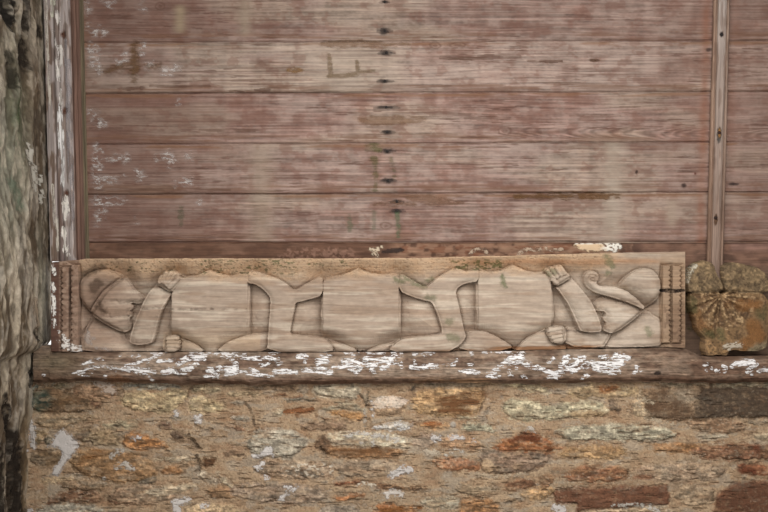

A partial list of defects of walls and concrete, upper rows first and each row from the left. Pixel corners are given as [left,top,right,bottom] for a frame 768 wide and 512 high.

peeling [51,265,439,381]
peeling [450,351,641,380]
peeling [703,359,768,376]